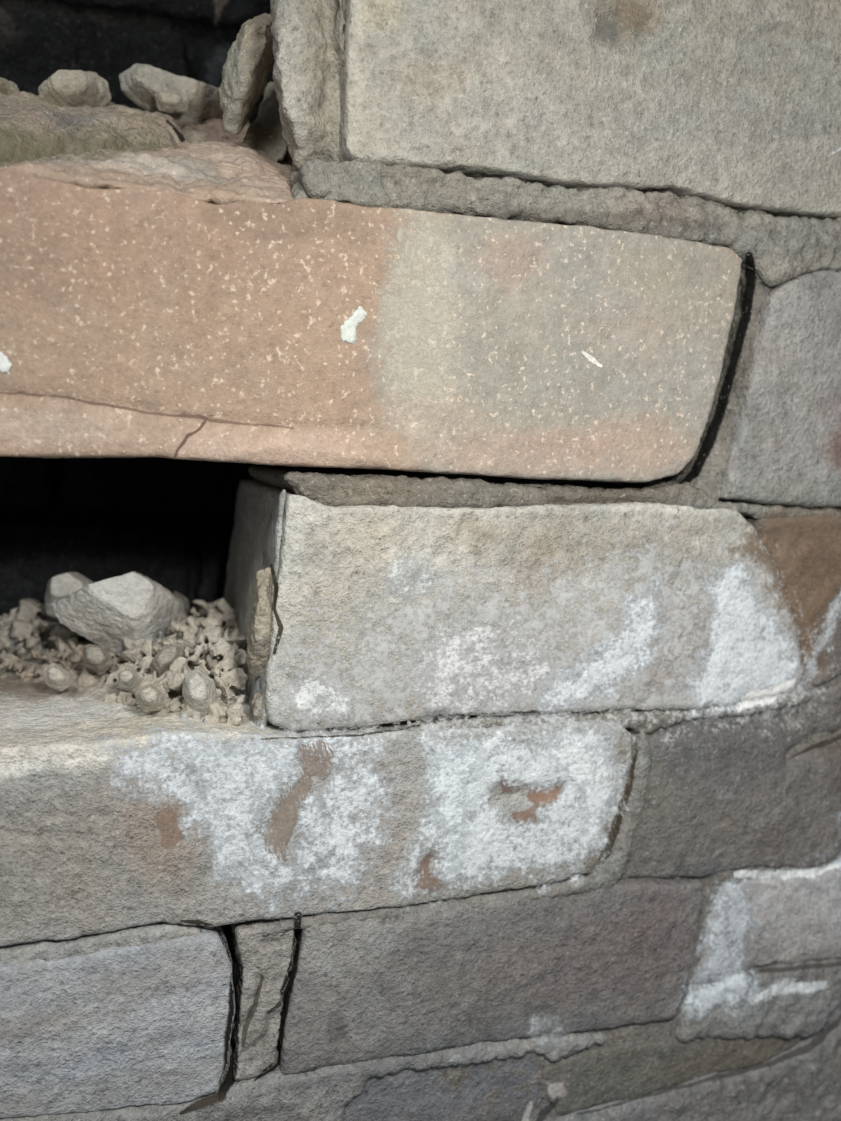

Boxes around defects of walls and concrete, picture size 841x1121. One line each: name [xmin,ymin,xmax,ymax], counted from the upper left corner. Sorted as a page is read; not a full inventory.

spalling [0,13,294,204]
crack [678,252,757,484]
damp [97,517,841,911]
crack [179,912,302,1115]
damp [677,848,841,1019]